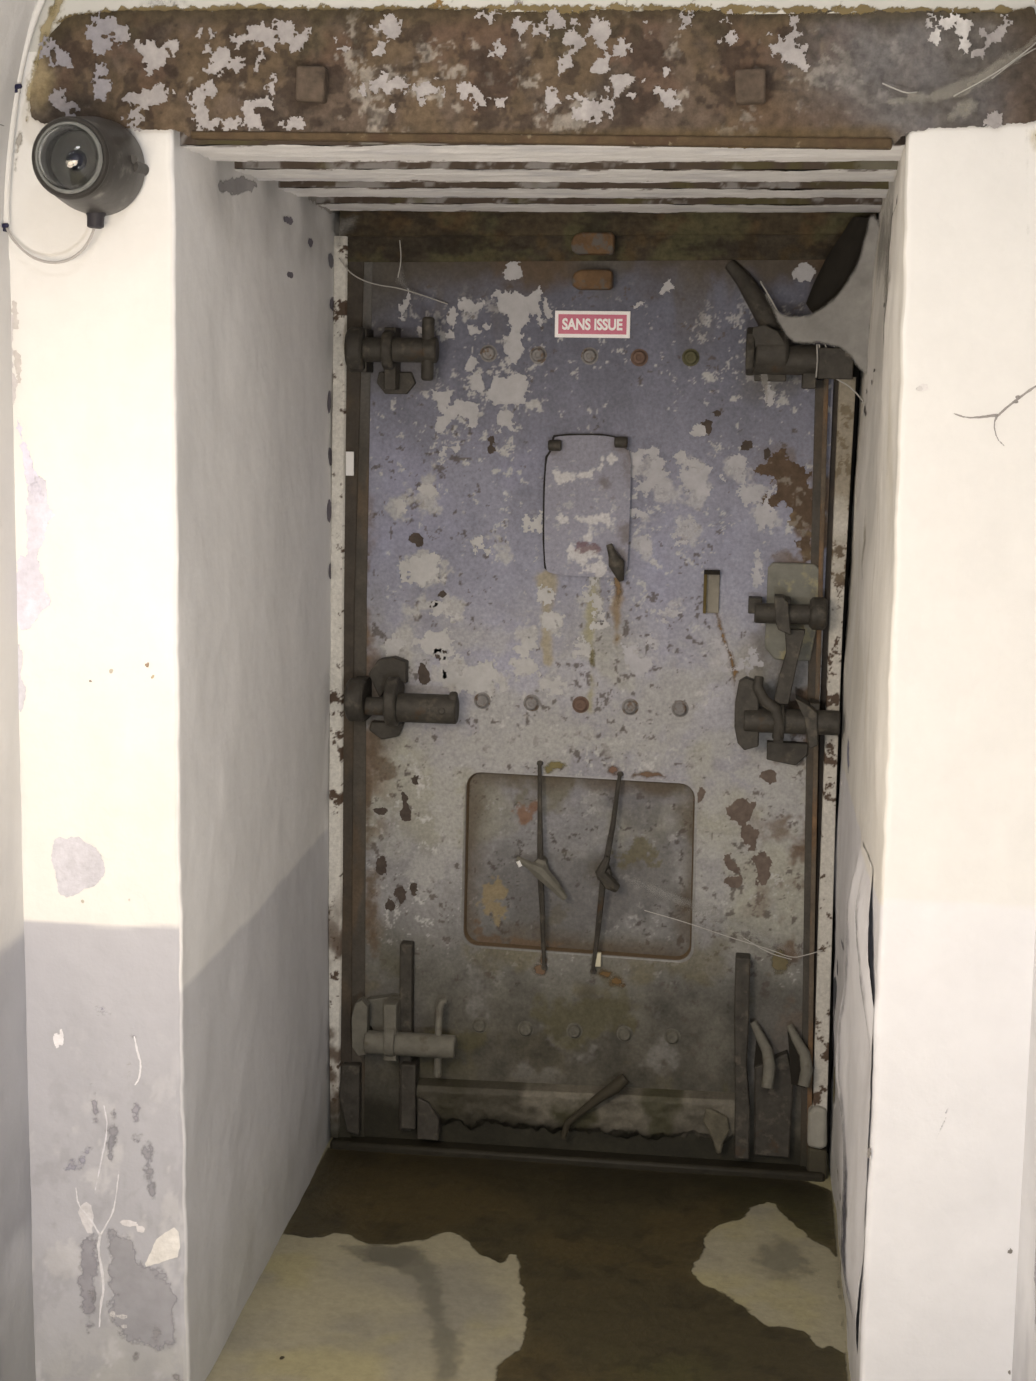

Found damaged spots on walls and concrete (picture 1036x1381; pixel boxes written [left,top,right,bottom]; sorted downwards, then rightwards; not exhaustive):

peeling [38,35,74,68]
peeling [48,11,312,132]
peeling [358,13,508,113]
peeling [474,0,681,124]
peeling [678,10,694,30]
peeling [717,9,739,46]
peeling [766,13,811,72]
peeling [925,10,1013,60]
crack [955,386,1036,444]
flaking render [51,837,105,903]
peeling [78,1202,180,1355]
damp [284,1148,849,1381]